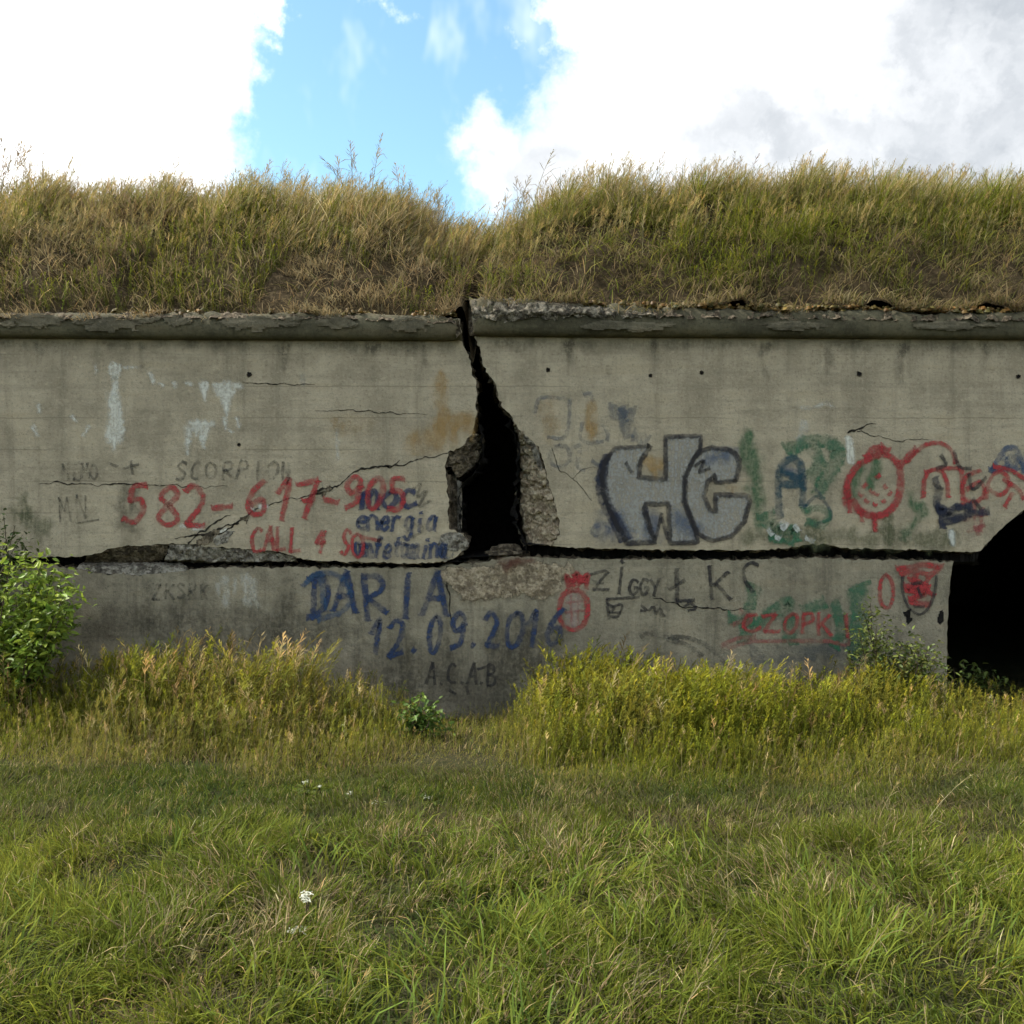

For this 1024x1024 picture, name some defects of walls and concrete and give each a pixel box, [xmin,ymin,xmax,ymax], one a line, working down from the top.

peeling [0,311,456,333]
spalling [472,297,1024,332]
damp [96,363,133,448]
damp [186,382,241,453]
crack [40,480,225,488]
crack [140,300,979,618]
crack [0,555,86,568]
spalling [438,532,578,602]